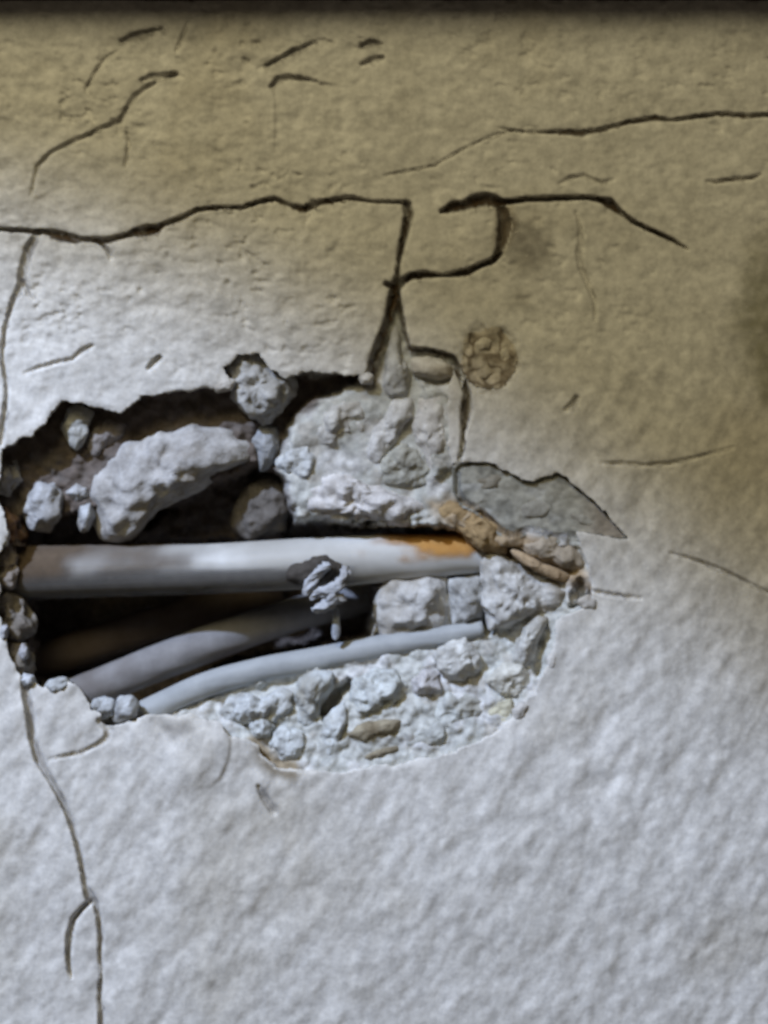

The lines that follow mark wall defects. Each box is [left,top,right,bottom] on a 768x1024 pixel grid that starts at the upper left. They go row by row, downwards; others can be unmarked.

crack [546,113,768,135]
crack [192,198,362,213]
crack [444,196,668,240]
crack [8,224,167,253]
crack [370,208,498,451]
spalling [0,279,628,773]
rust [387,534,477,557]